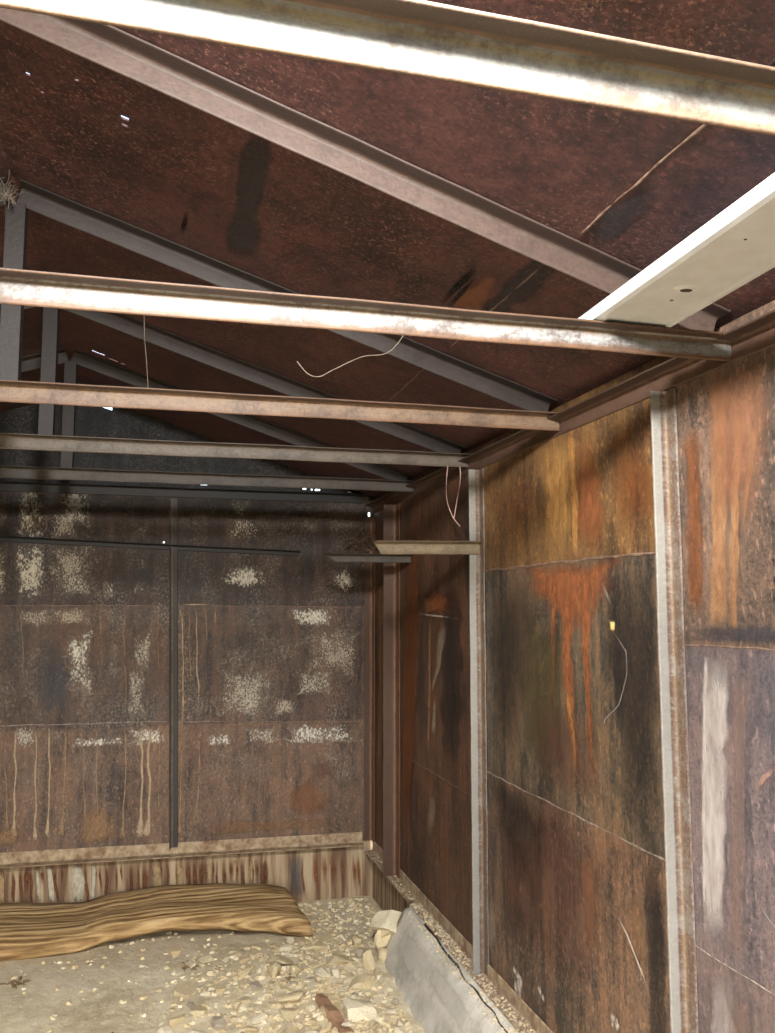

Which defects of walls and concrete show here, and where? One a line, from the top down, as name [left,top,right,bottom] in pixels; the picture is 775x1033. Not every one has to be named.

damp [227,139,270,252]
damp [20,497,307,517]
corrosion [545,440,602,547]
corrosion [534,564,607,770]